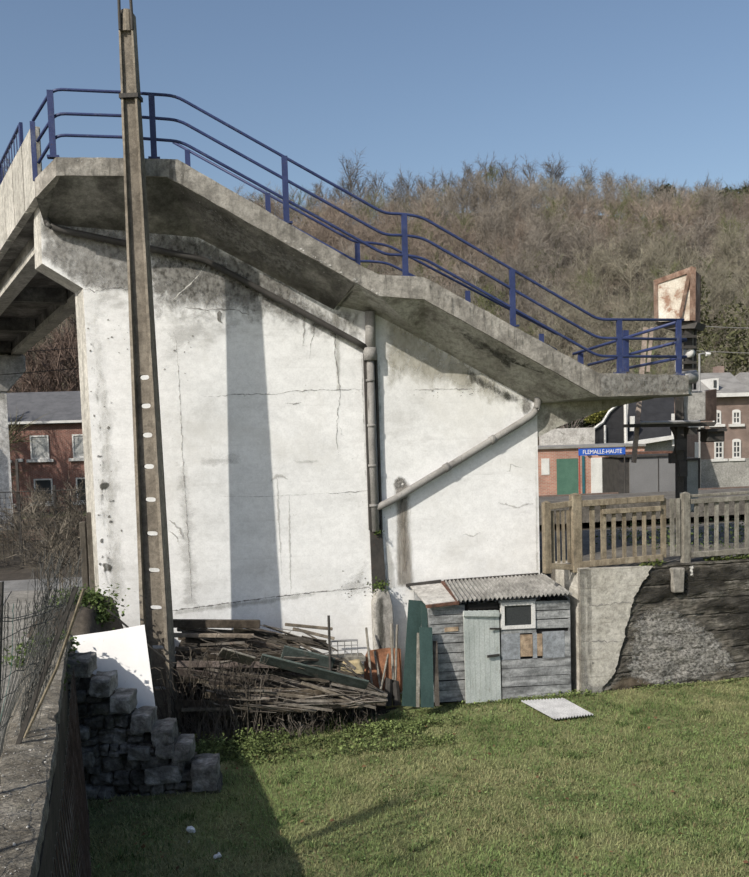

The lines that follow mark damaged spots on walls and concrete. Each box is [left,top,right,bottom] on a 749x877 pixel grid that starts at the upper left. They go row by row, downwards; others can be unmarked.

crack [174,264,247,323]
water stain [149,209,357,336]
crack [209,315,360,453]
water stain [389,326,513,400]
water stain [464,334,526,368]
water stain [396,484,411,585]
water stain [639,566,749,602]